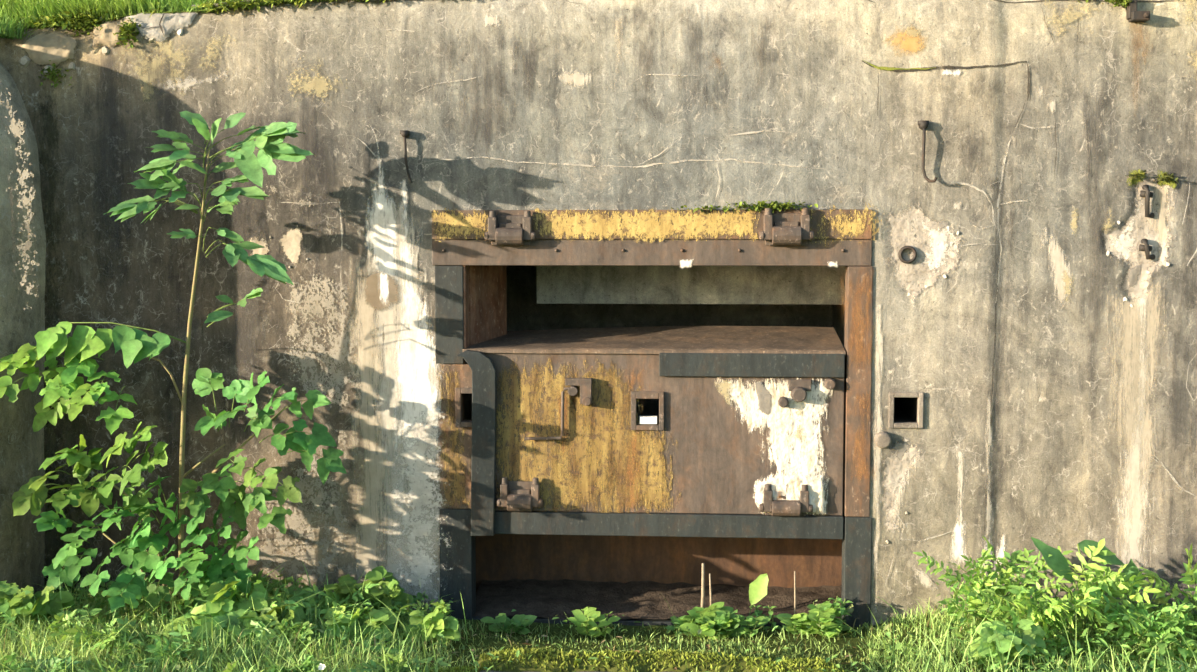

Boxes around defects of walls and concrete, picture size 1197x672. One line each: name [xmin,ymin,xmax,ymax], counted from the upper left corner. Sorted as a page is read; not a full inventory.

crack [994,0,1197,42]
leakage [559,72,591,87]
peeling [431,208,488,242]
peeling [533,208,760,243]
spalling [809,204,963,306]
crack [862,60,1057,531]
spalling [1101,169,1177,307]
leakage [351,160,451,610]
crack [1151,455,1197,497]
crack [885,505,952,589]